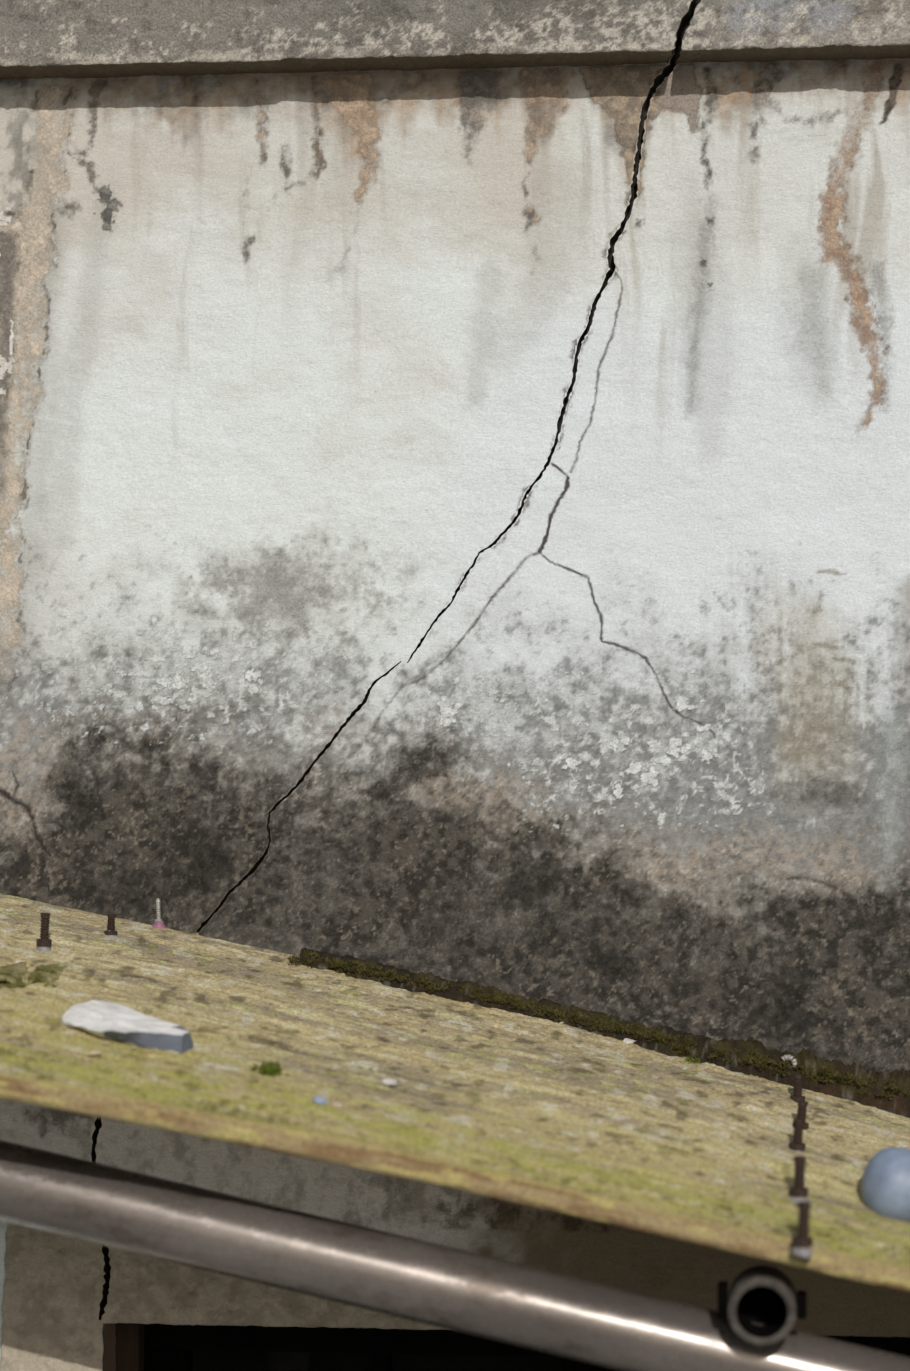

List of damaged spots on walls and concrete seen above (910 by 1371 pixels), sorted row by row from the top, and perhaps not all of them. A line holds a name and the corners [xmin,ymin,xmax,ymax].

damp [68,80,107,190]
damp [256,80,290,189]
damp [312,73,380,201]
damp [702,68,718,178]
corrosion [818,59,902,425]
peeling [0,85,76,704]
crack [196,0,715,933]
peeling [36,615,348,744]
crack [0,778,51,857]
damp [0,718,910,1073]
crack [91,1117,102,1162]
crack [99,1245,111,1319]